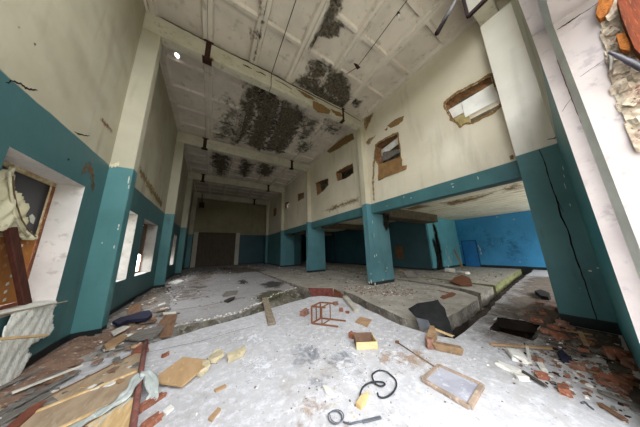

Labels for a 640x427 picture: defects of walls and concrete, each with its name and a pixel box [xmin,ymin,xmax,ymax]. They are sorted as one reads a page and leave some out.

leakage [310,0,344,48]
crack [6,80,38,91]
leakage [210,152,232,176]
leakage [238,159,277,177]
leakage [215,83,341,154]
spalling [296,88,342,117]
leakage [293,59,362,108]
peeling [327,133,354,153]
peeling [375,116,404,166]
spalling [443,73,502,128]
spalling [600,0,640,153]
crack [539,137,597,320]